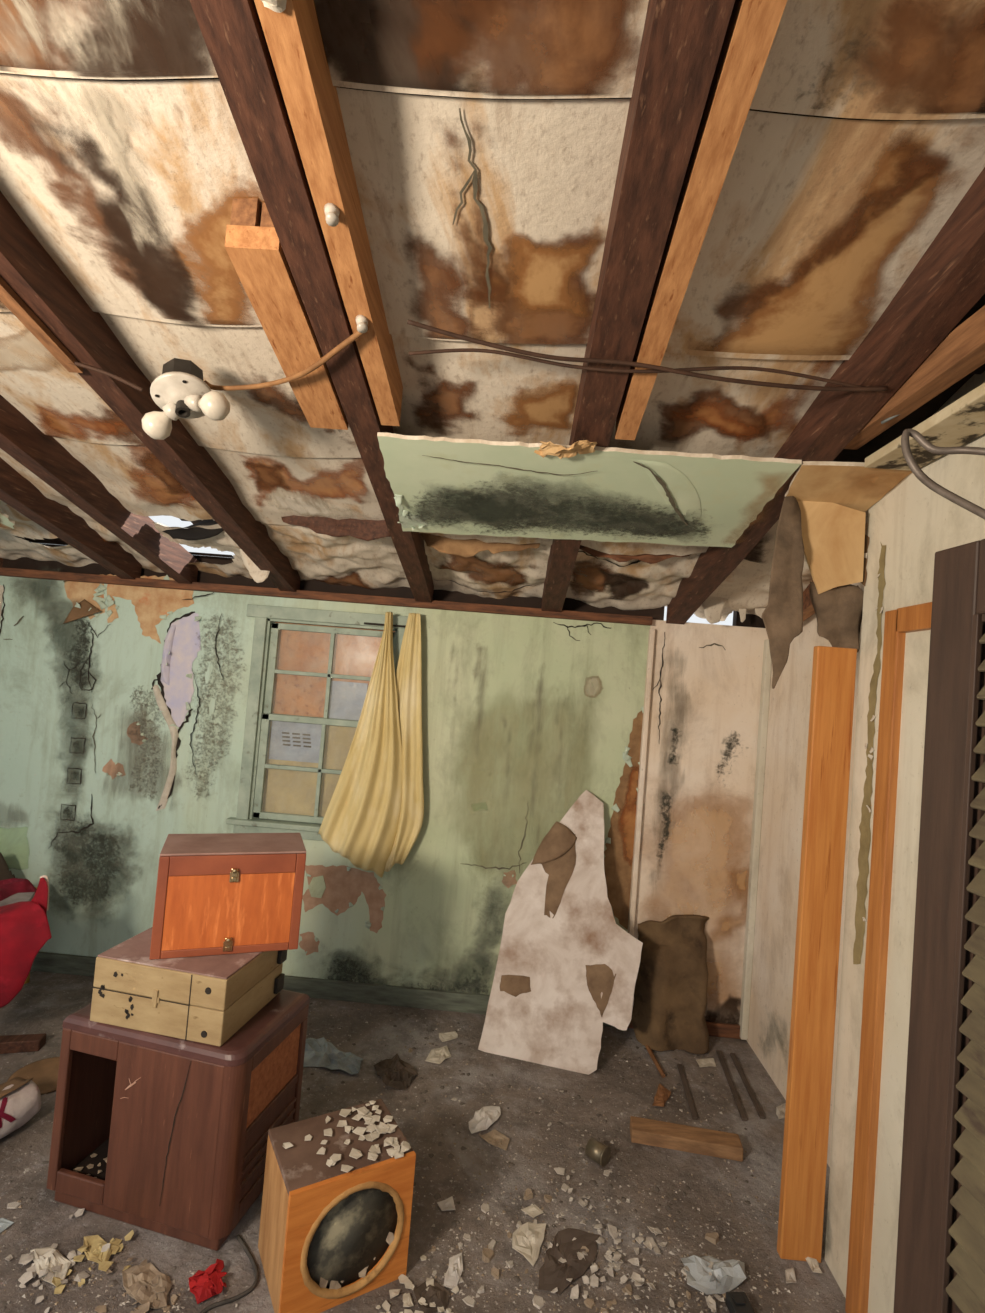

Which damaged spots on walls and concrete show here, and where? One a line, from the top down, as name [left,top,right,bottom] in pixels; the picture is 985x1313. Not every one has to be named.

water stain [313,0,634,95]
water stain [0,0,265,328]
crack [452,108,492,308]
water stain [408,209,602,344]
water stain [704,140,949,385]
water stain [409,481,708,537]
peeling [61,574,202,730]
water stain [16,579,132,916]
peeling [299,932,320,956]
peeling [302,865,386,933]
peeling [604,707,644,930]
water stain [659,793,683,858]